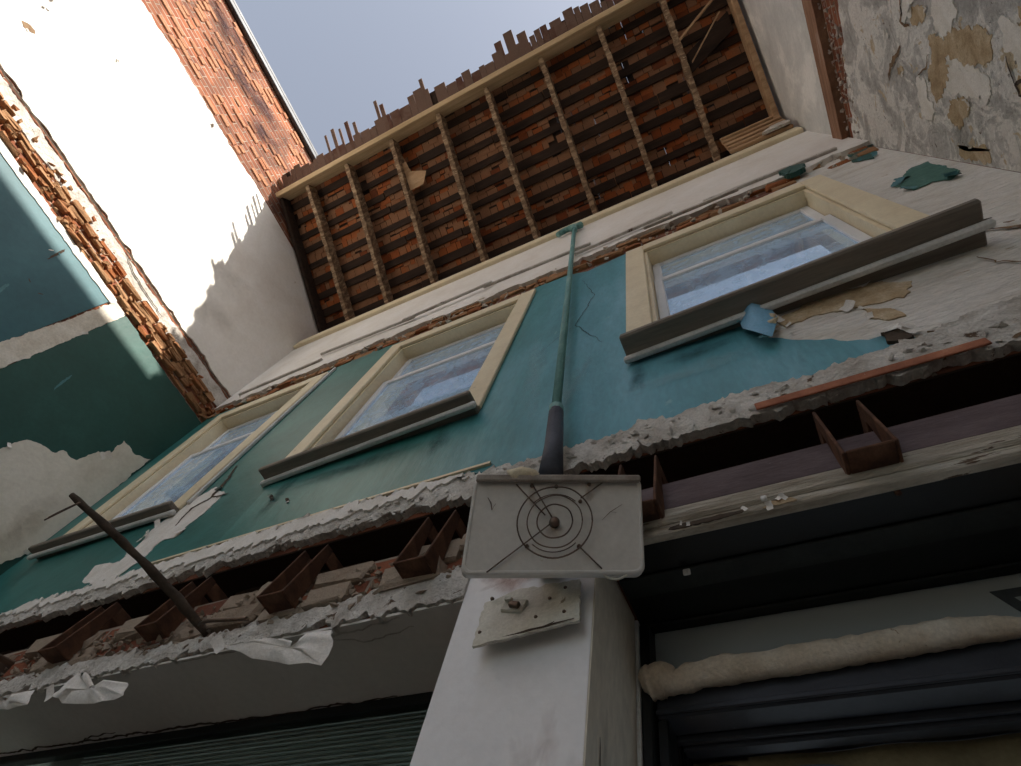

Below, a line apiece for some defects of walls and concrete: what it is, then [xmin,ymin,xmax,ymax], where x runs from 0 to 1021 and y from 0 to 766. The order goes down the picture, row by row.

flaking render [900,0,1021,130]
peeling [762,120,791,136]
flaking render [644,144,1021,345]
peeling [0,302,126,368]
peeling [0,440,150,564]
flaking render [209,630,333,665]
flaking render [0,672,128,710]